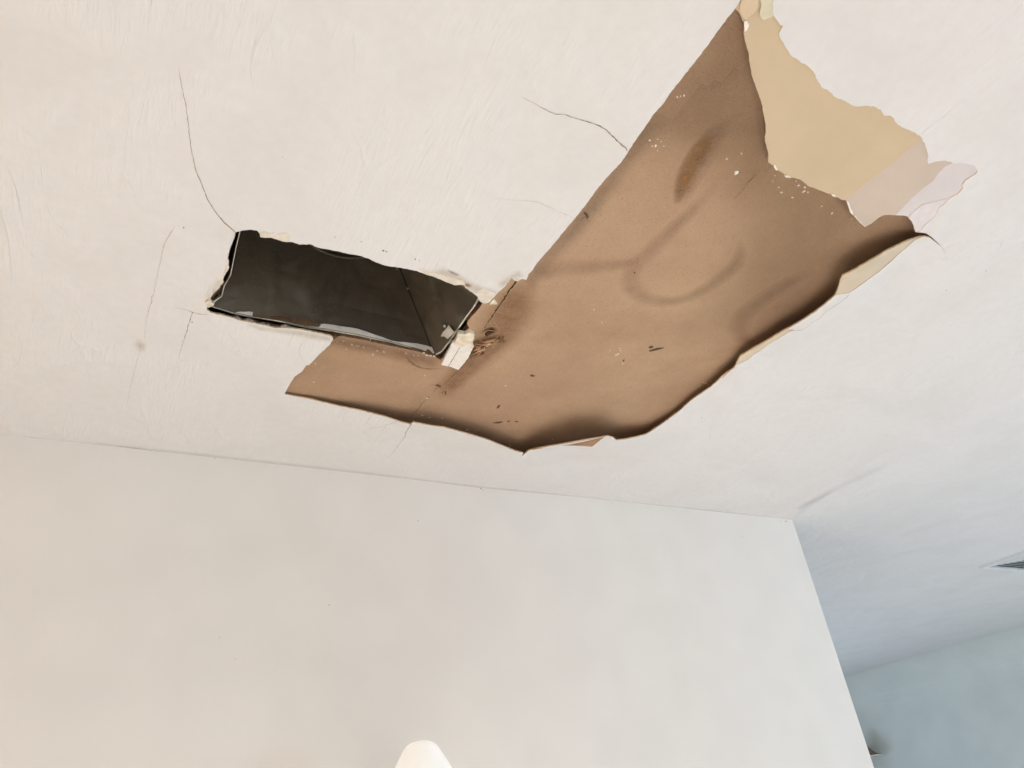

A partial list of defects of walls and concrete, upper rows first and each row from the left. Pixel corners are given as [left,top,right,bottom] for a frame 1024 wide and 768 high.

crack [179,72,235,232]
crack [526,99,627,151]
flaking render [221,0,977,454]